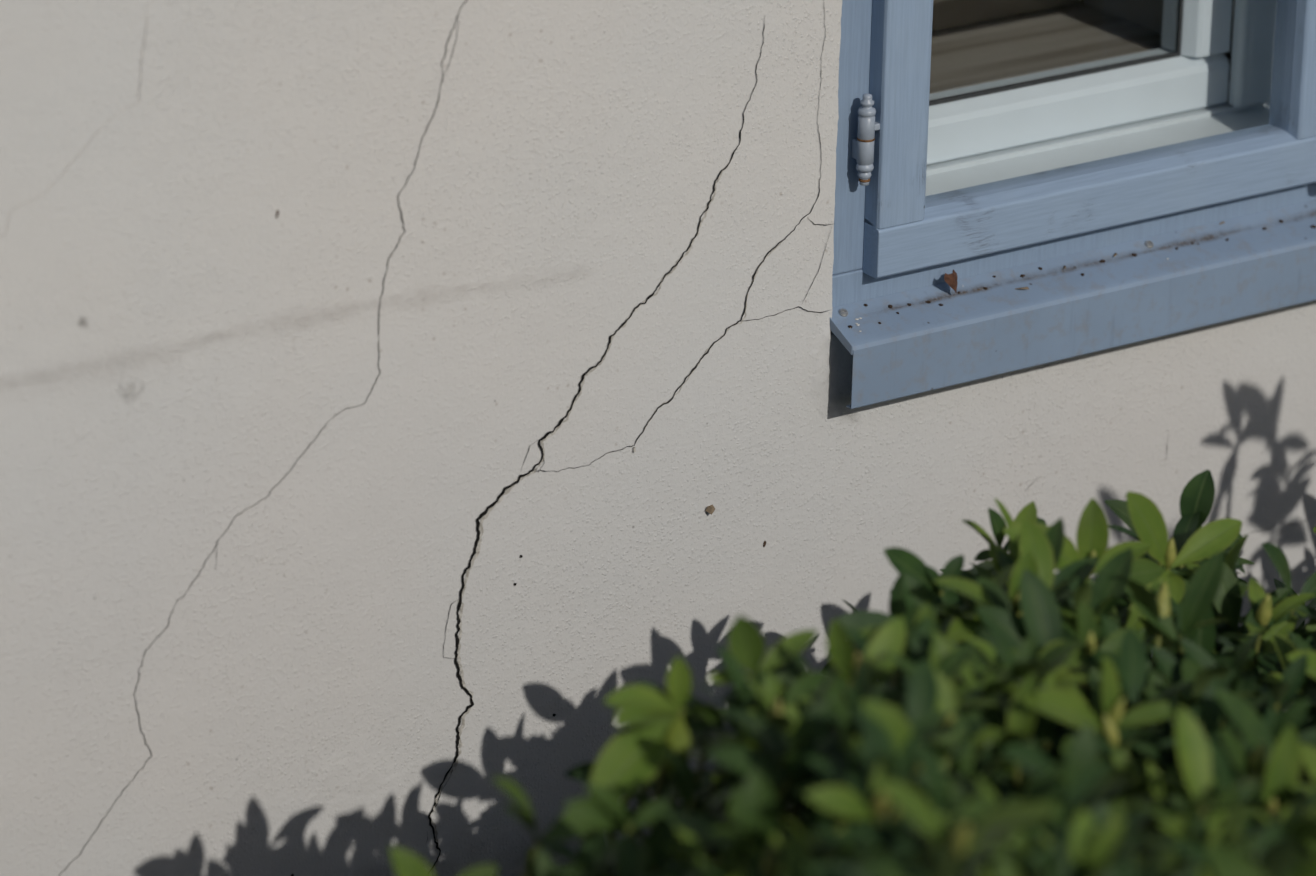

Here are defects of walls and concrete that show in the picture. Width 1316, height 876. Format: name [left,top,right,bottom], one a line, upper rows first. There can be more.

crack [59,0,468,876]
crack [426,9,832,871]